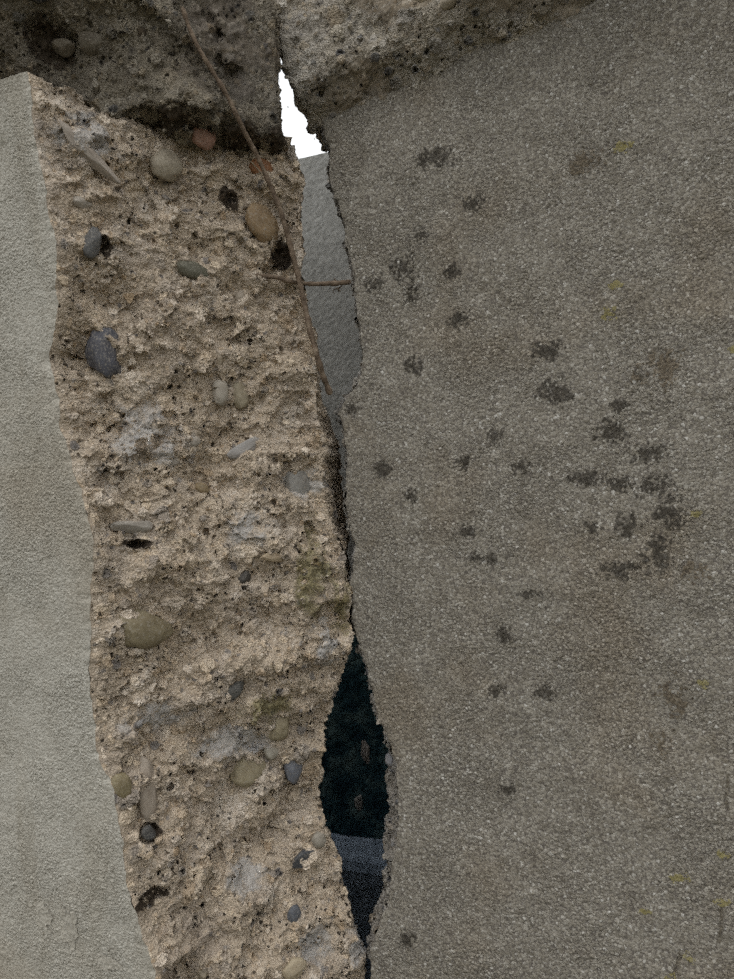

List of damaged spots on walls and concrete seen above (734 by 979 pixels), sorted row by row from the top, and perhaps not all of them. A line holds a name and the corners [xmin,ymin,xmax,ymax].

spalling [320,127,363,584]
spalling [349,605,399,961]